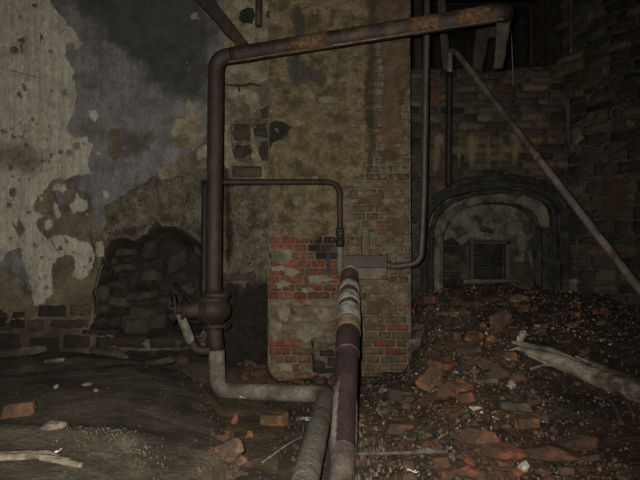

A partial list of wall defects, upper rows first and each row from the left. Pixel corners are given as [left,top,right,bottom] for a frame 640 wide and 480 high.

flaking render [215,0,370,44]
flaking render [380,36,410,160]
peeling [0,0,235,343]
flaking render [222,43,371,293]
flaking render [270,298,336,374]